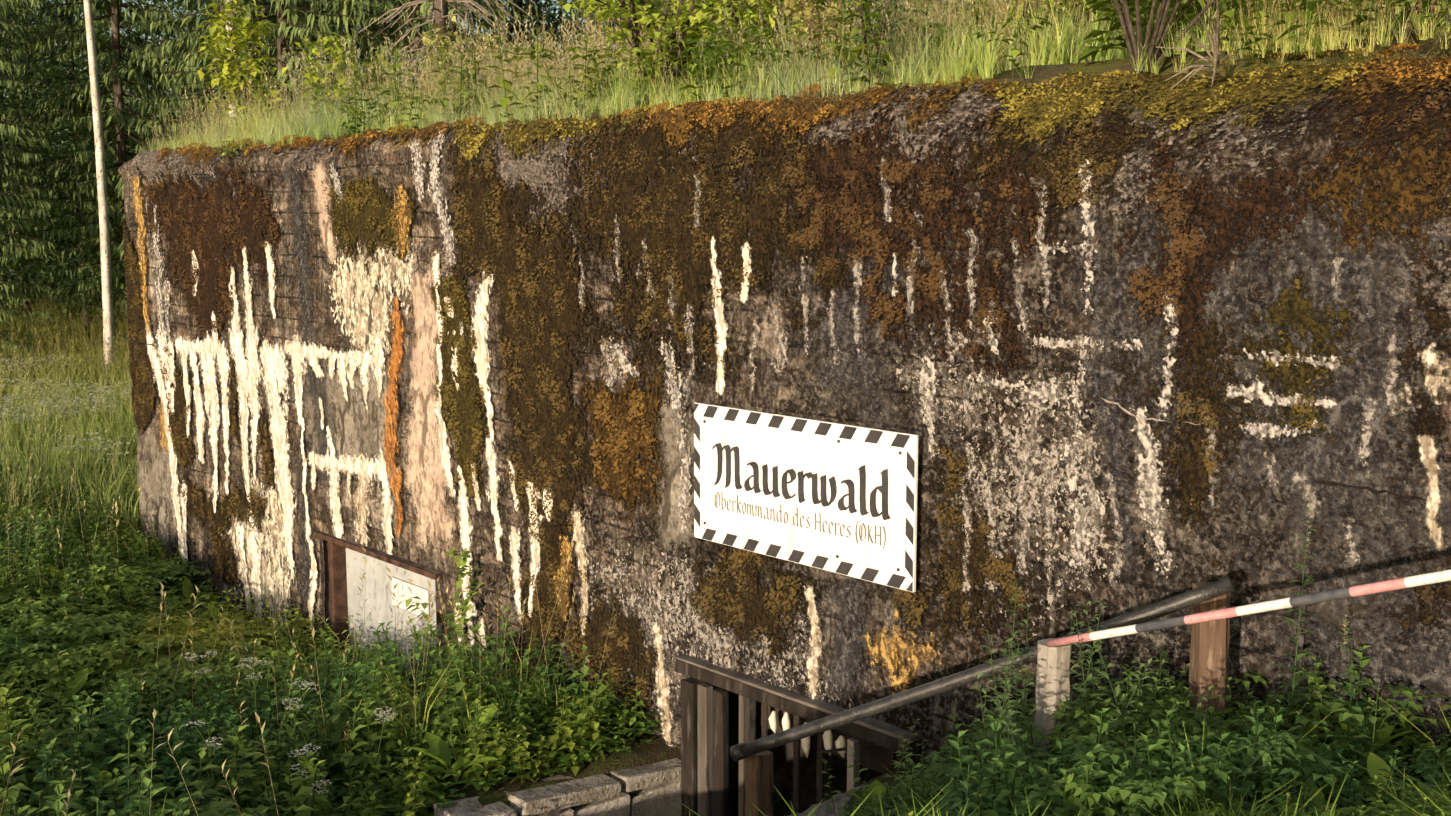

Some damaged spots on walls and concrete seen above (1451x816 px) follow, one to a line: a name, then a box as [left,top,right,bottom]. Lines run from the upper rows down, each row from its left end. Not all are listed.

damp [145,162,398,632]
corrosion [383,297,404,537]
efflorescence [408,129,552,654]
efflorescence [573,512,589,635]
efflorescence [710,237,752,395]
damp [778,217,940,457]
damp [966,159,1190,575]
damp [1200,116,1451,748]